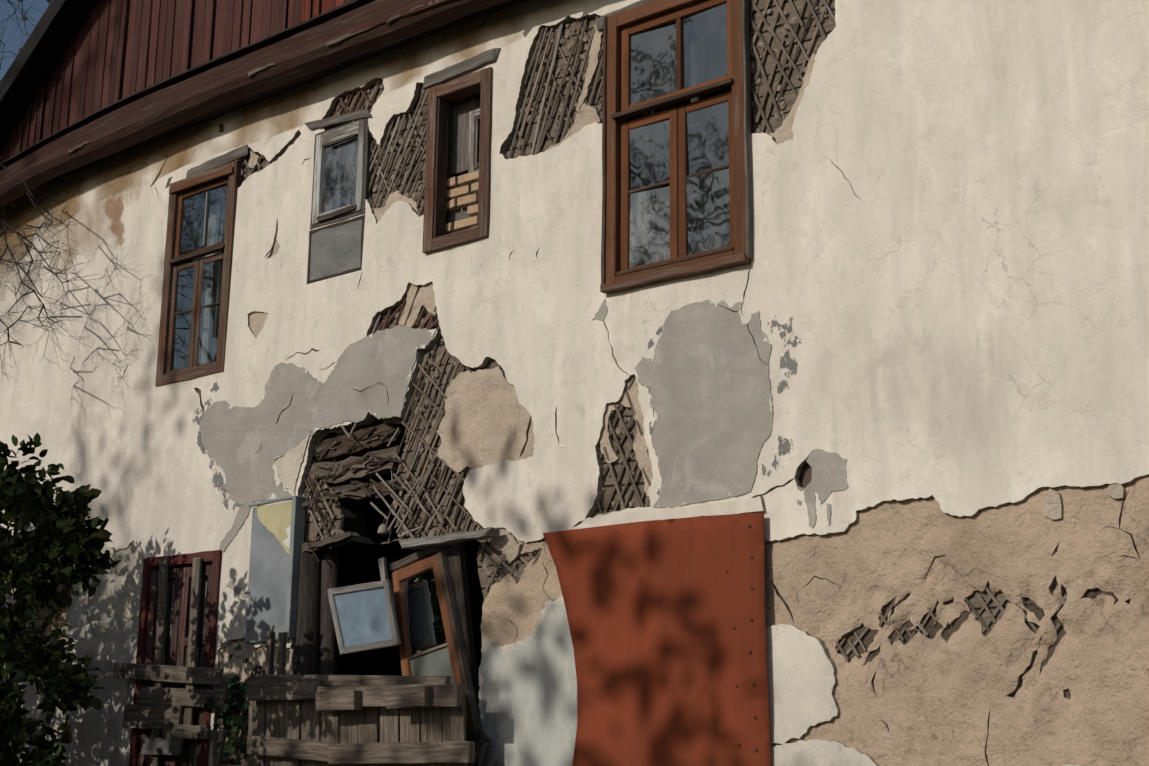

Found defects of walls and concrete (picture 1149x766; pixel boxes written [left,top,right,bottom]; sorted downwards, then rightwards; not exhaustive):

spalling [328,79,384,130]
spalling [368,85,428,222]
spalling [505,15,603,159]
spalling [749,0,836,144]
spalling [267,283,577,766]
spalling [591,325,664,518]
peeling [710,299,752,325]
peeling [762,426,793,477]
peeling [762,314,802,411]
spalling [800,464,812,488]
spalling [765,475,1149,766]